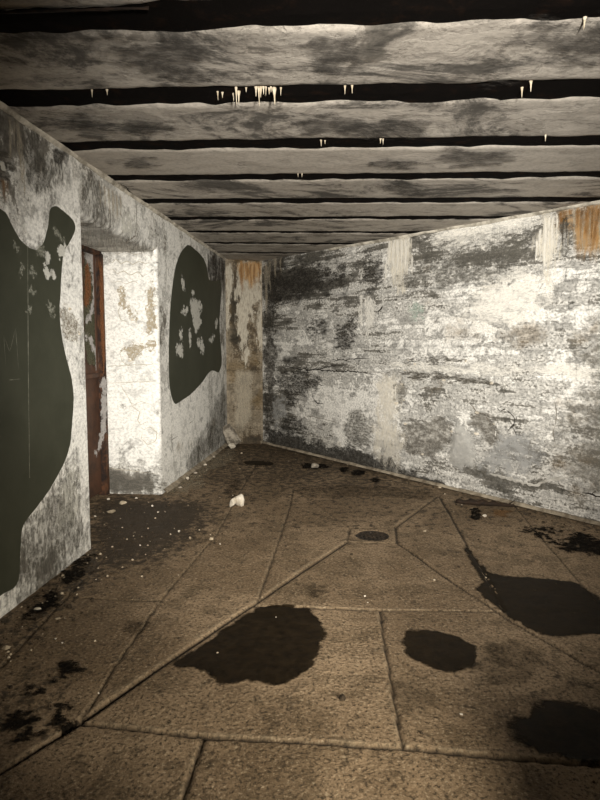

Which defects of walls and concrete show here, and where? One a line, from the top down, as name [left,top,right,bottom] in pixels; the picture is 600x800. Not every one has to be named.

peeling [0,206,81,596]
peeling [169,245,222,404]
rust [234,261,262,366]
leakage [256,258,445,485]
leakage [362,213,572,332]
leakage [391,346,600,383]
rust [560,205,600,253]
leakage [464,545,600,636]
leakage [173,604,327,685]
leakage [401,629,503,673]
leakage [507,699,600,767]